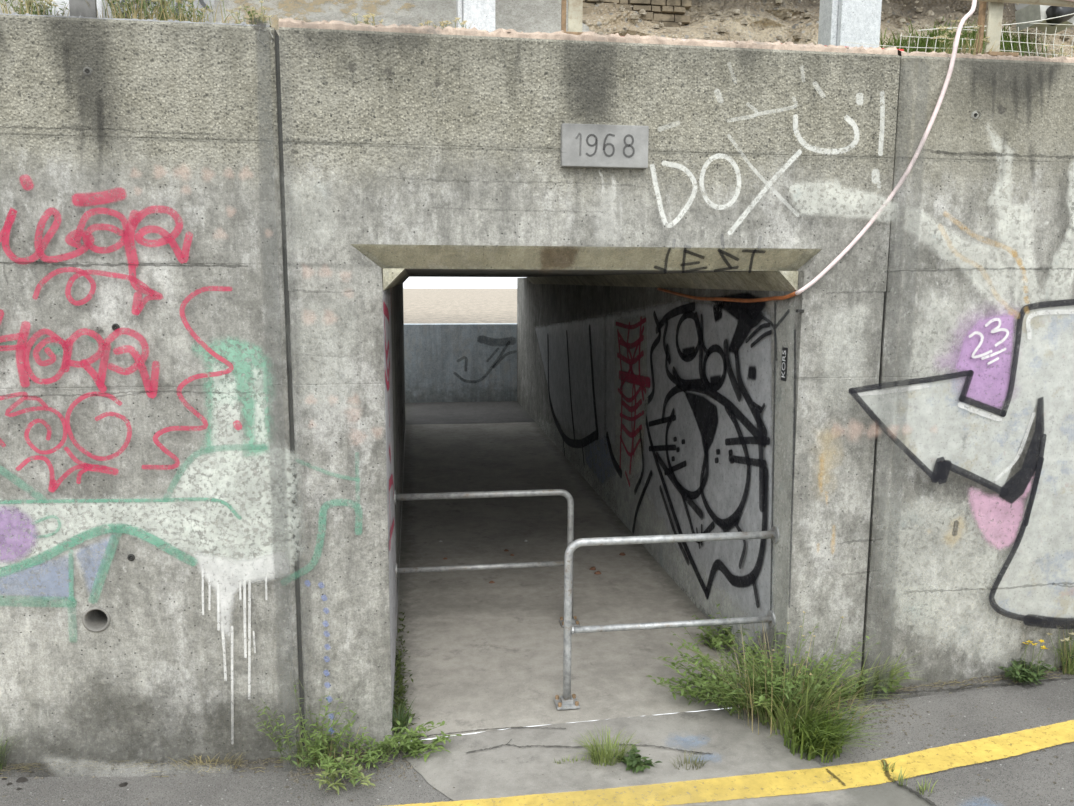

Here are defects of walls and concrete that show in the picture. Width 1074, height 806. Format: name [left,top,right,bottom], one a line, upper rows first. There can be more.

leakage [52,14,105,149]
leakage [964,58,1059,119]
crack [417,727,713,754]